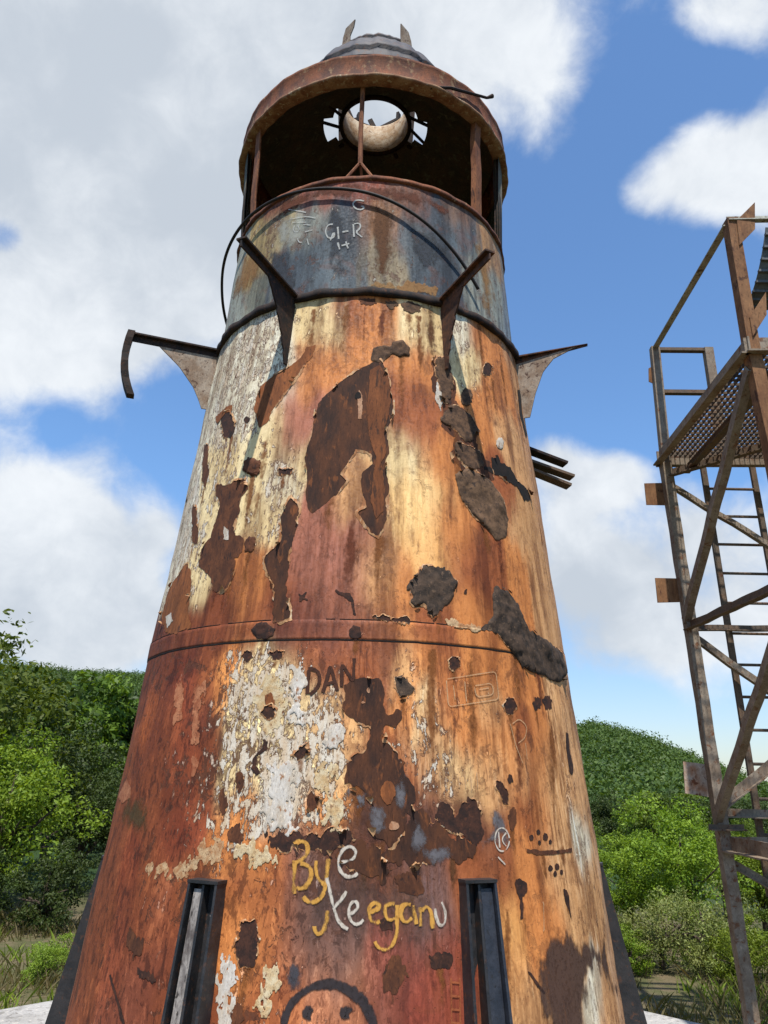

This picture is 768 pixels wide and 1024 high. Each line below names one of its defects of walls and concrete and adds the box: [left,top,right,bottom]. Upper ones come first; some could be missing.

corrosion [234,256,258,294]
corrosion [280,184,448,297]
corrosion [416,310,434,367]
peeling [431,355,507,481]
peeling [262,358,395,625]
peeling [158,477,248,634]
corrosion [344,527,355,573]
peeling [252,649,312,736]
corrosion [427,649,436,742]
peeling [145,677,484,917]